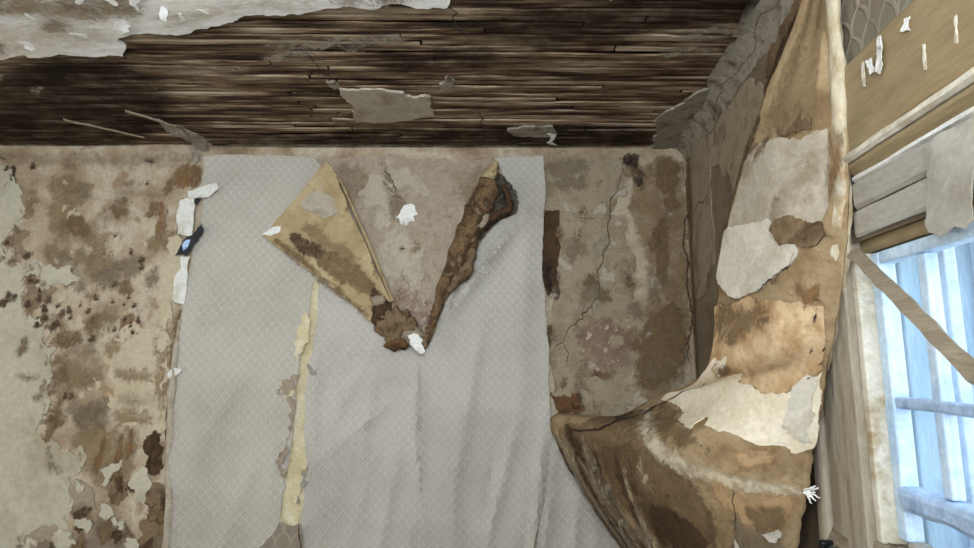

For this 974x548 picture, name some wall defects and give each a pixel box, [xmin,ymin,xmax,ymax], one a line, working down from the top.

peeling [0,0,140,32]
peeling [865,35,883,75]
peeling [0,165,173,548]
leakage [26,176,182,434]
peeling [263,226,281,236]
peeling [275,313,316,478]
flaking render [300,153,495,333]
crack [551,158,626,366]
leakage [561,156,802,496]
leakage [72,514,88,548]
leakage [556,424,672,548]
leakage [746,506,784,531]